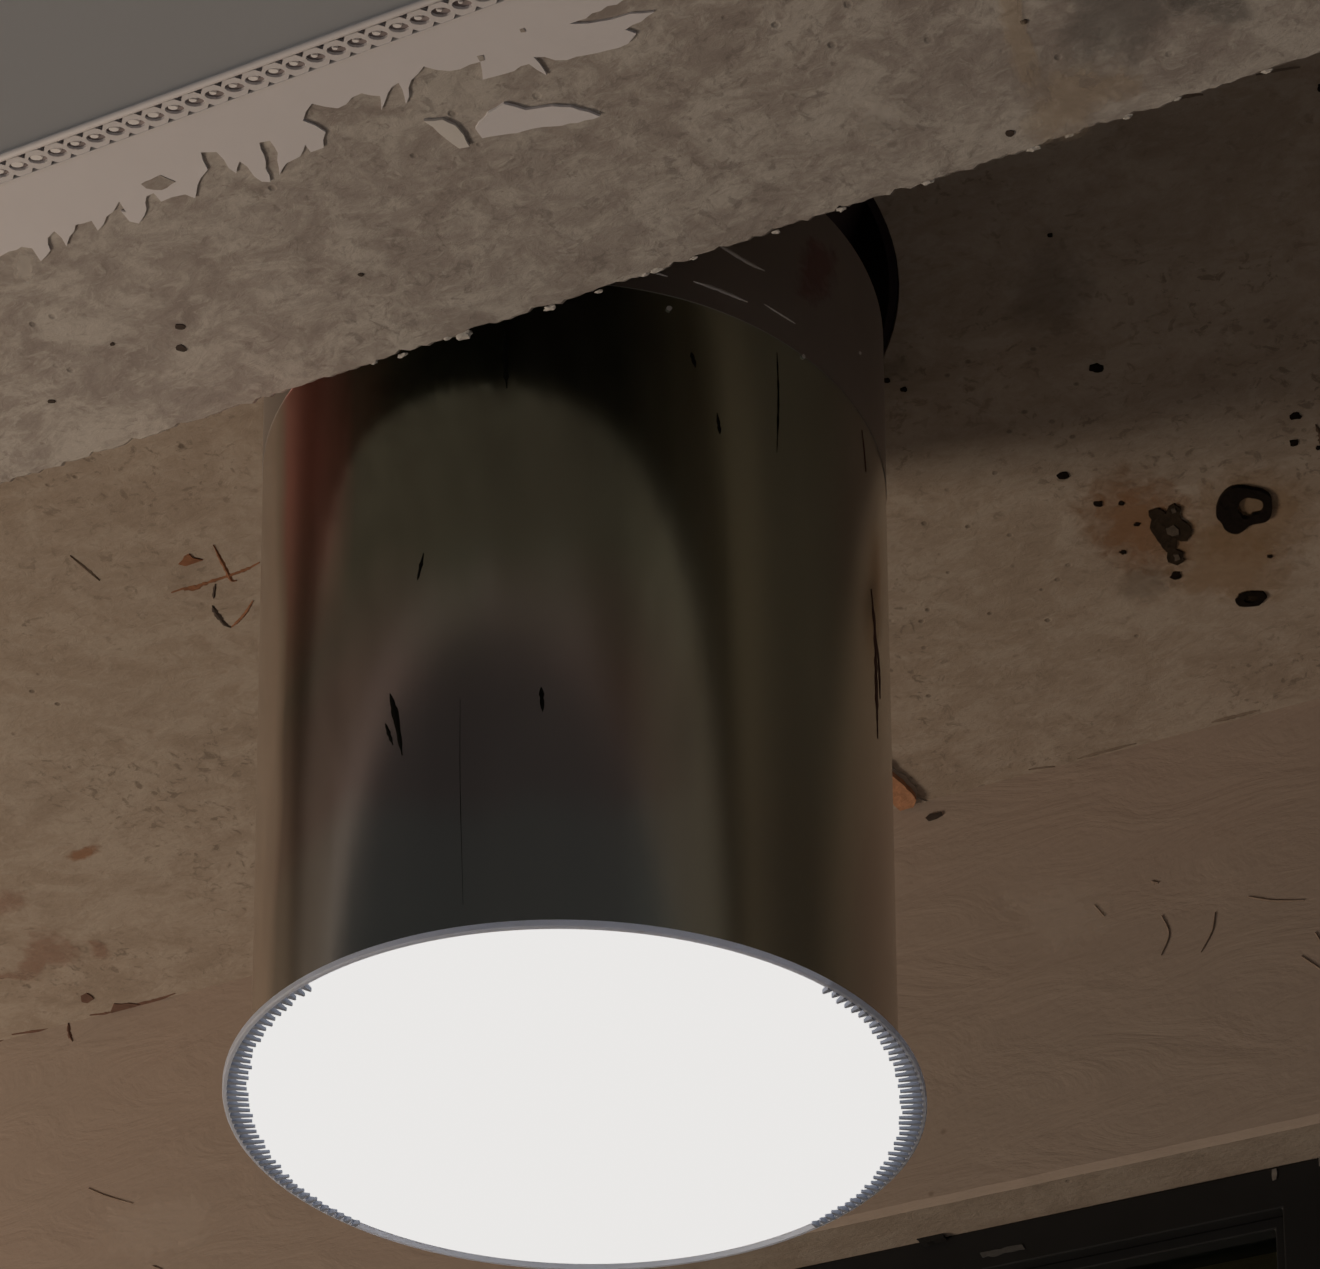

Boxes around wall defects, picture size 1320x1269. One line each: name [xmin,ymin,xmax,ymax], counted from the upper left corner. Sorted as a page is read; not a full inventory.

peeling [0,0,654,261]
spalling [175,324,187,352]
spalling [444,330,473,341]
corrosion [1093,484,1182,563]